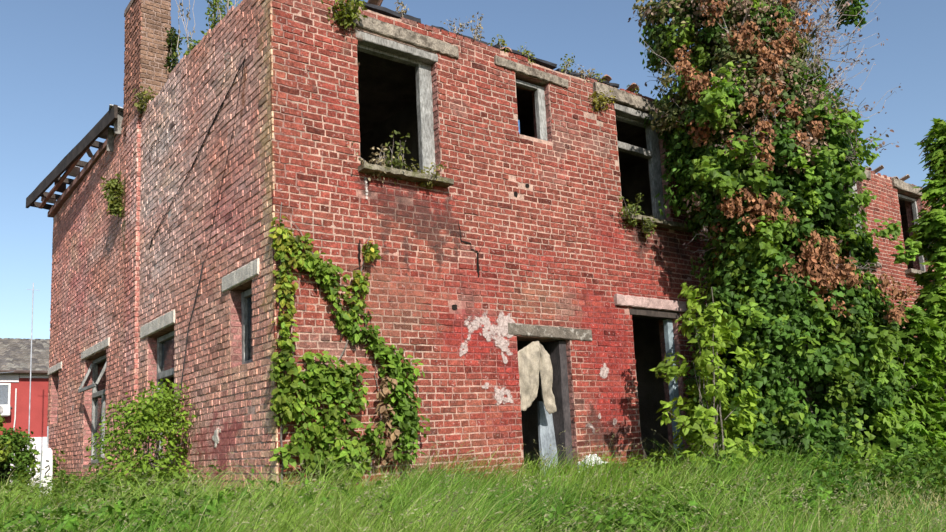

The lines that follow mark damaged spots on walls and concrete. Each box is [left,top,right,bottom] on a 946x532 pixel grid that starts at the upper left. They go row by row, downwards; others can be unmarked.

spalling [459,312,515,364]
spalling [482,382,513,405]